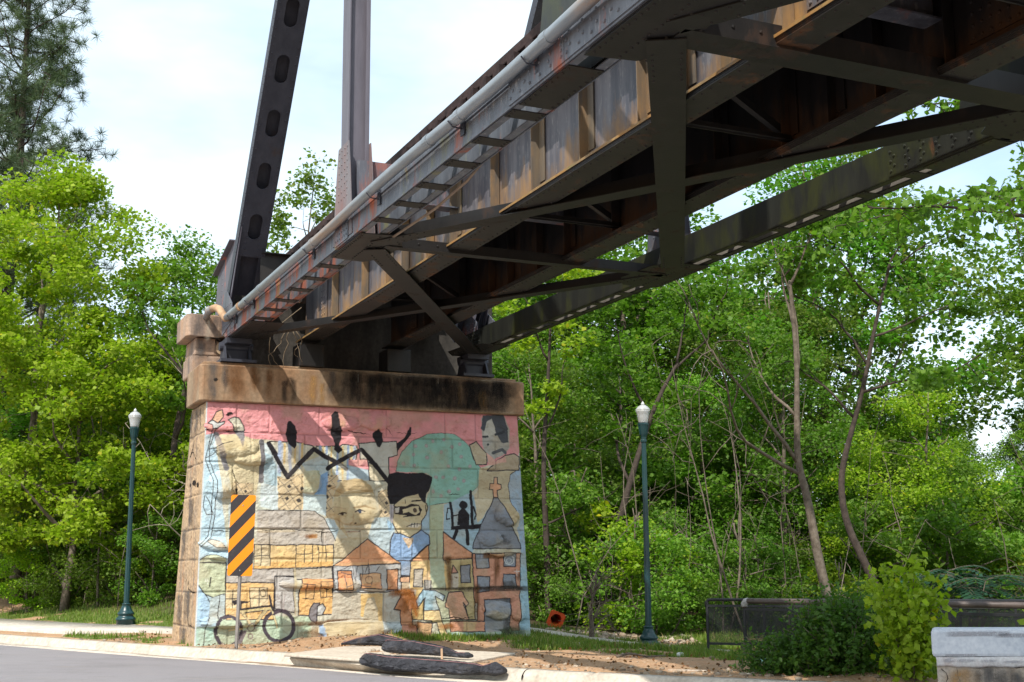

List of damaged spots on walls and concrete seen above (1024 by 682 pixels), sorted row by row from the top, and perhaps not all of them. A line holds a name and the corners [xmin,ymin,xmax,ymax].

damp [329,372,512,409]